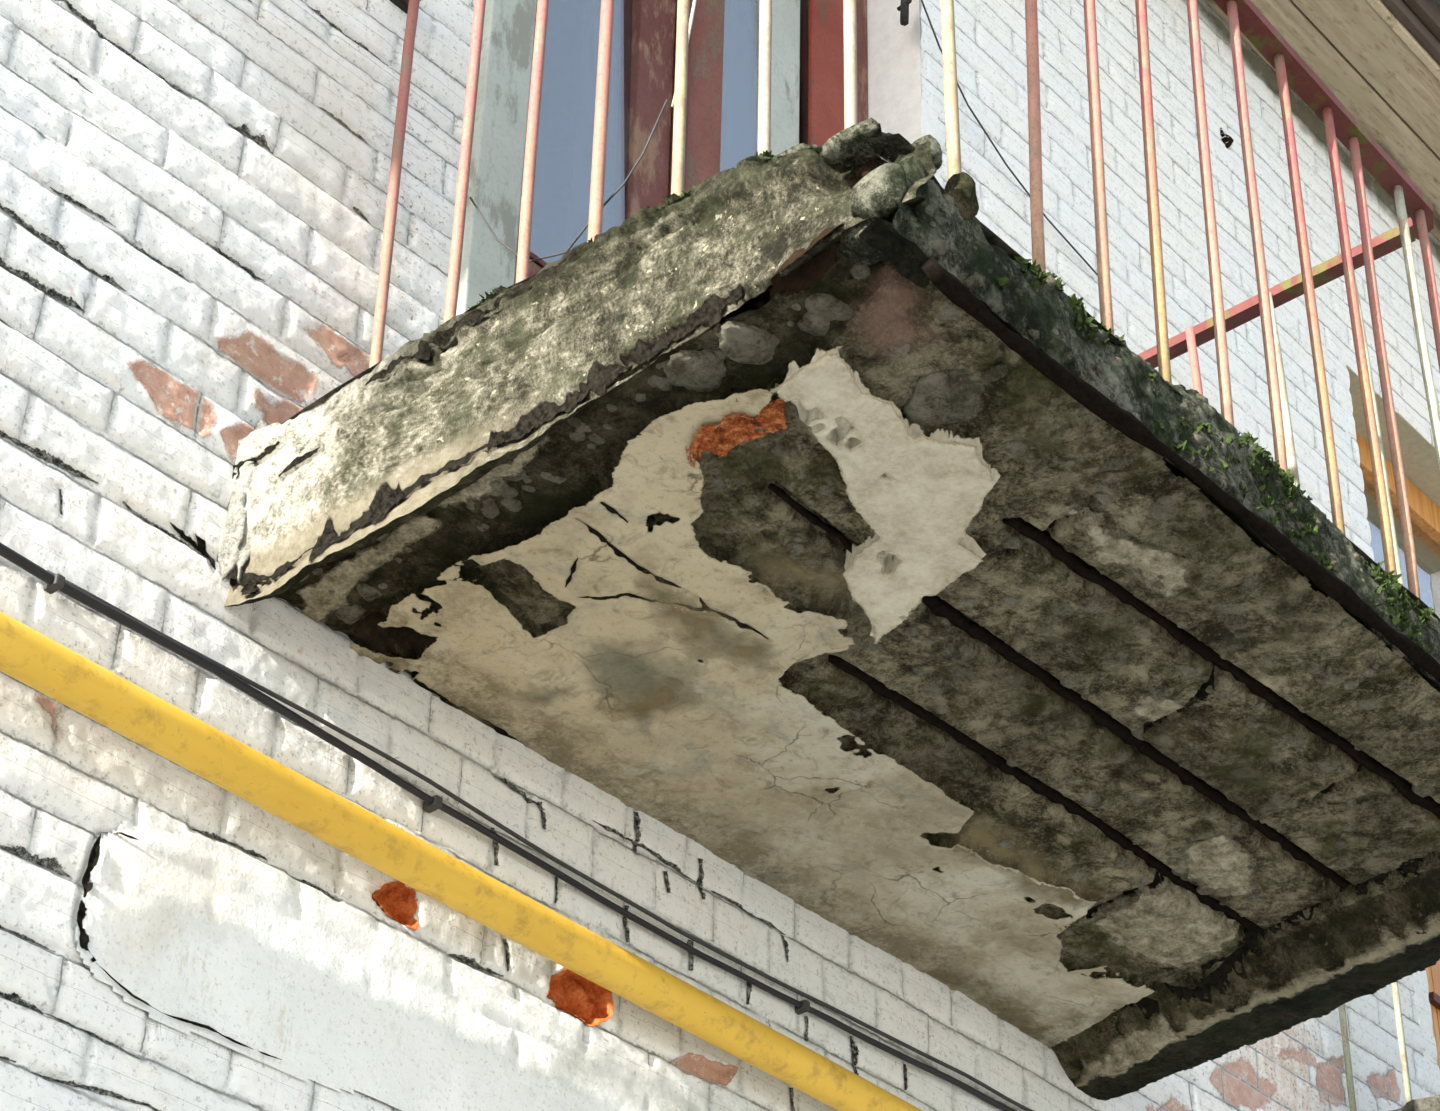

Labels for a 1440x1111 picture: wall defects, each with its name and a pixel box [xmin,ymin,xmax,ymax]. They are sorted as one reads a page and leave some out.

water stain [1197,0,1410,220]
water stain [1429,215,1440,260]
peeling [128,331,318,461]
rust [686,399,787,467]
crack [565,502,768,639]
spalling [275,223,1440,990]
crack [77,832,282,1060]
spalling [547,969,613,1026]
water stain [1166,915,1440,1046]
spalling [670,1053,738,1086]
water stain [1074,1061,1100,1087]
peeling [1210,1058,1277,1111]